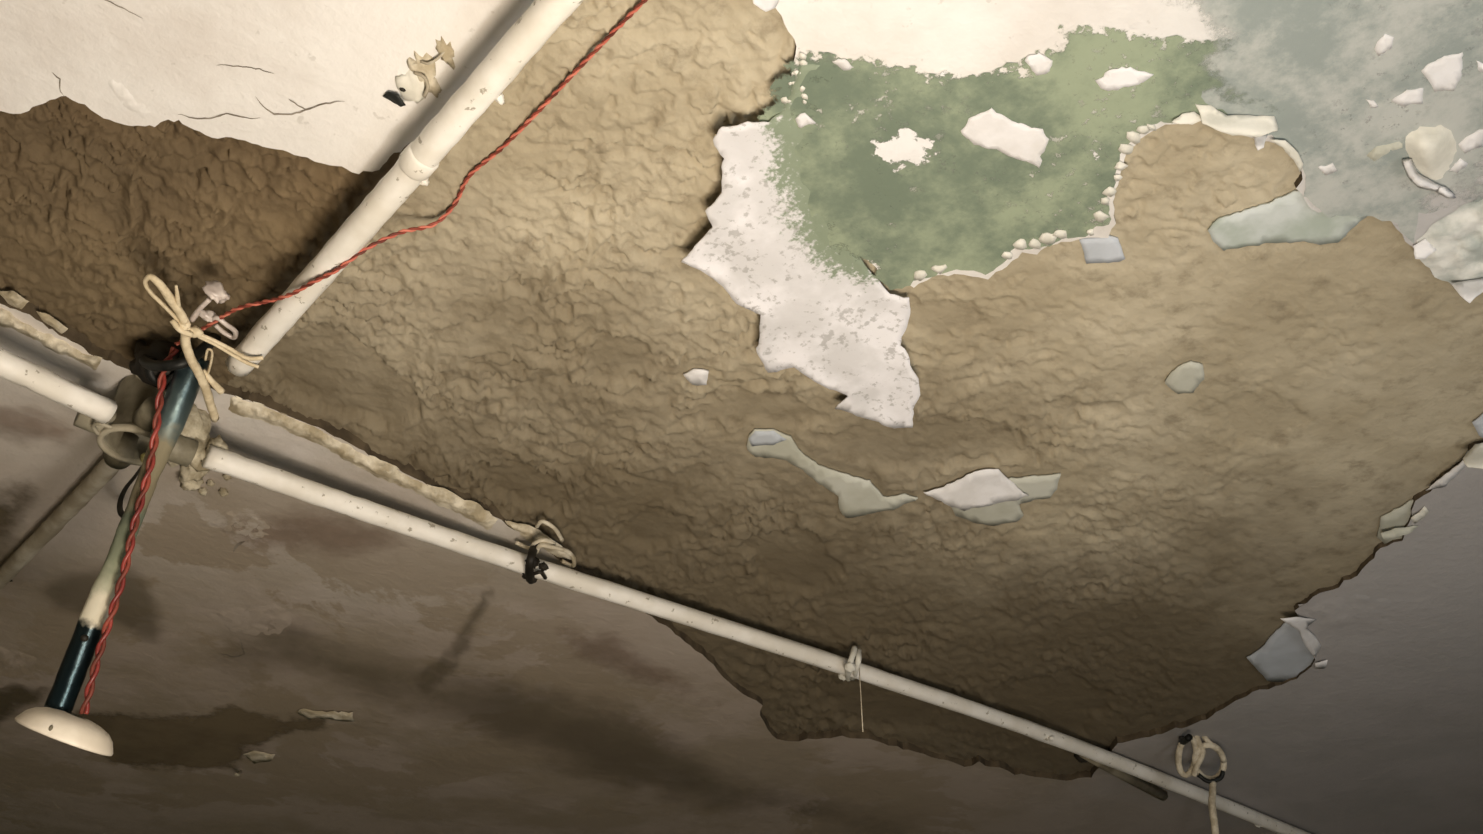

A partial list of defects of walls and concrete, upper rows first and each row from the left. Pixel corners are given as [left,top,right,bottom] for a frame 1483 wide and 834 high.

flaking render [0,96,409,361]
damp [757,0,1483,290]
flaking render [202,0,1483,750]
damp [77,708,325,768]
peeling [243,750,275,764]
flaking render [671,621,1094,775]